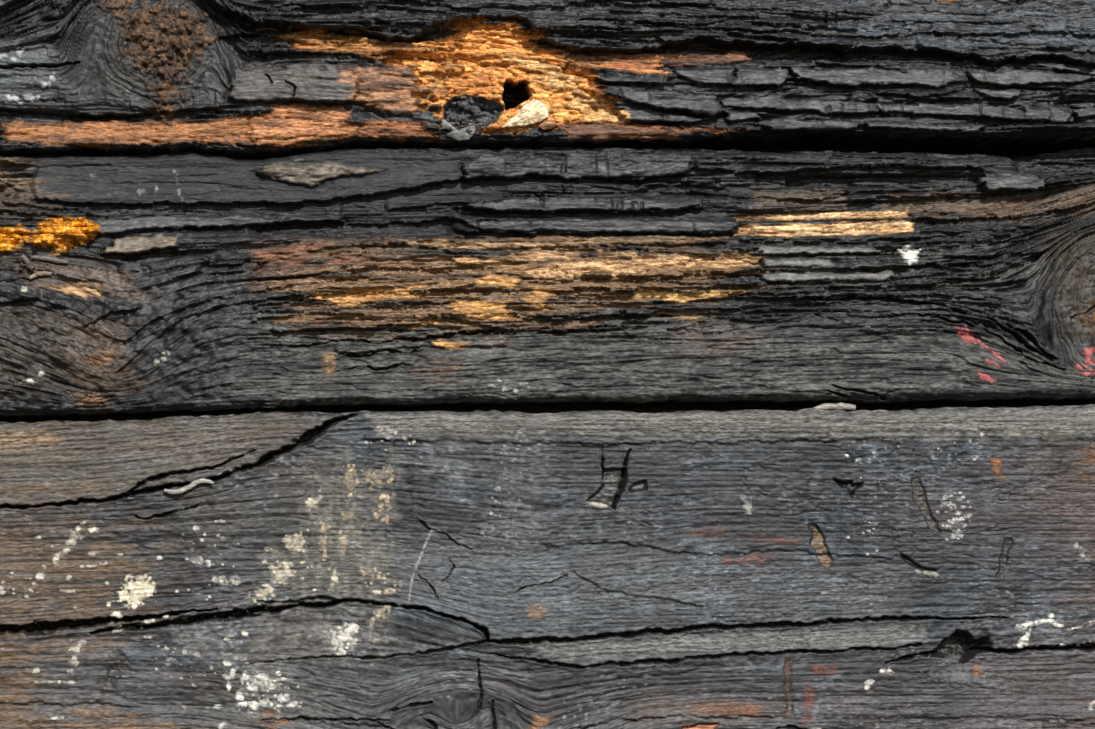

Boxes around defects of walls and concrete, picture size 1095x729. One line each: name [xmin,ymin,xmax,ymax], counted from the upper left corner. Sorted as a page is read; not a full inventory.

spalling [2,18,1095,150]
peeling [313,285,423,306]
peeling [433,340,467,349]
peeling [410,211,914,324]
peeling [897,246,921,264]
crack [0,414,356,519]
crack [0,521,1008,729]
crack [979,642,1095,654]